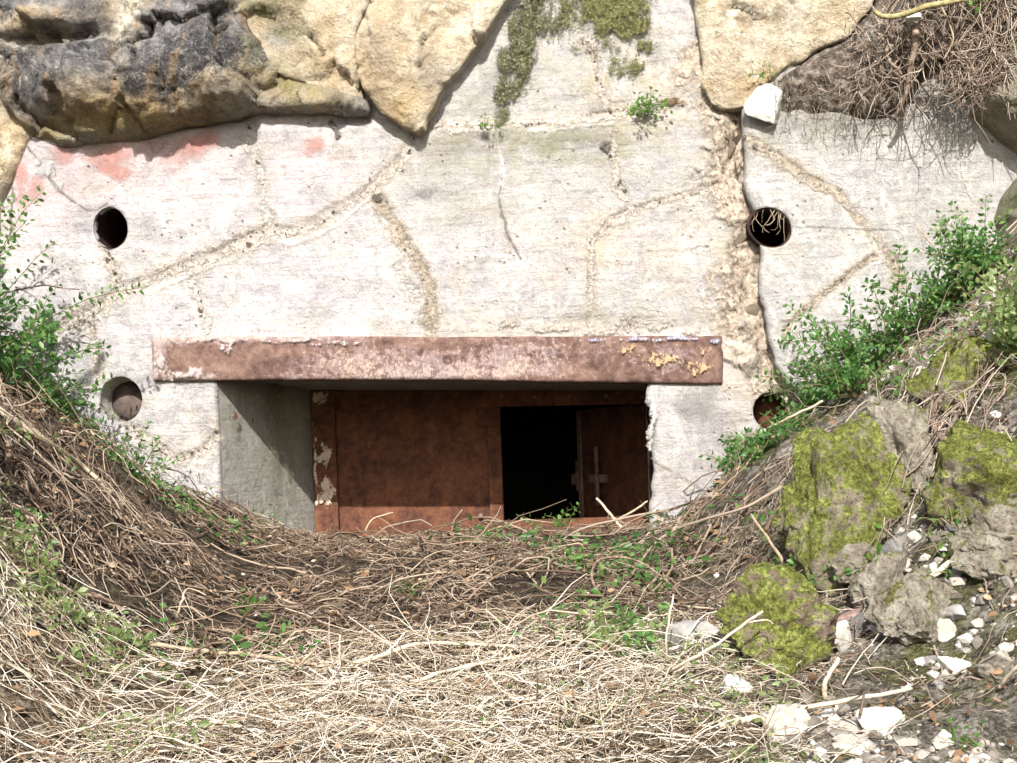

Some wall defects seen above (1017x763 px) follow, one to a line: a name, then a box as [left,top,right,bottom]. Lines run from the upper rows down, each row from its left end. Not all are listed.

crack [26,145,108,210]
crack [41,31,909,420]
corrosion [618,343,714,376]
peeling [312,423,336,515]